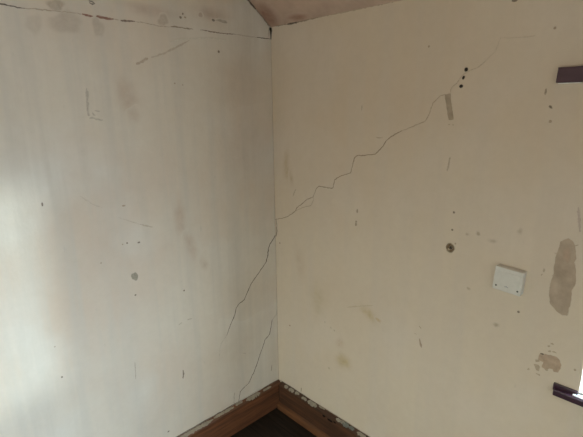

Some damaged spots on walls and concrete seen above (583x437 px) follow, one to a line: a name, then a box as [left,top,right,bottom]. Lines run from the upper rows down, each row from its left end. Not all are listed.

crack [0,0,397,39]
crack [219,35,536,359]
peeling [549,238,578,316]
peeling [527,343,562,376]